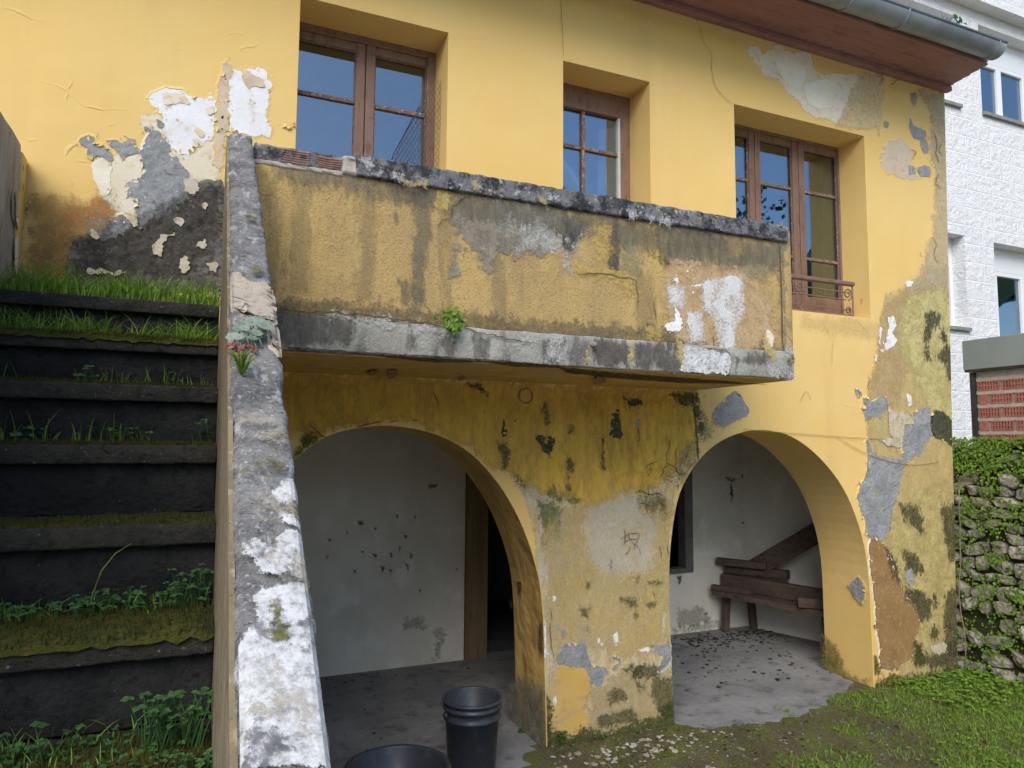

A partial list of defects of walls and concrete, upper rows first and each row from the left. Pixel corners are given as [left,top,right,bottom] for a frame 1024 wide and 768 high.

peeling [745,42,880,125]
spalling [76,57,297,241]
peeling [879,118,931,181]
leakage [26,177,224,295]
crack [578,273,657,325]
peeling [664,266,746,375]
peeling [874,316,897,363]
mould [922,311,951,384]
leakage [271,159,793,729]
spalling [710,389,750,430]
spalling [847,388,933,671]
spalling [544,621,622,709]